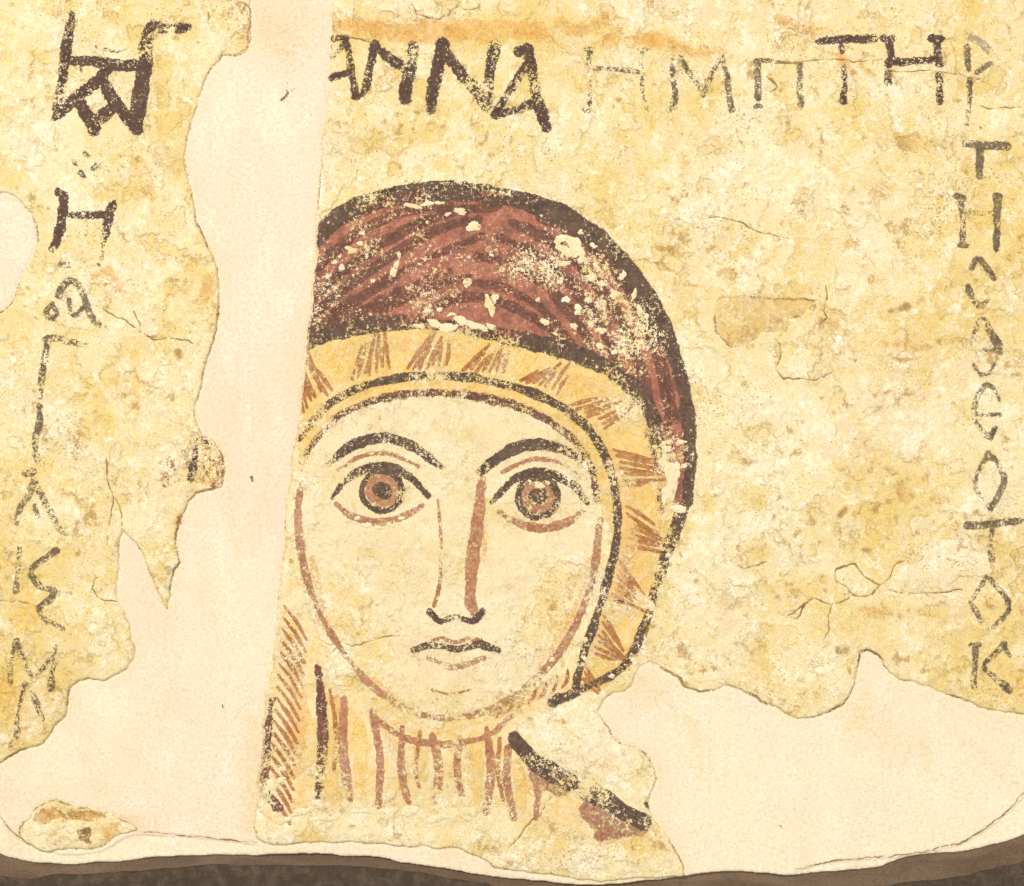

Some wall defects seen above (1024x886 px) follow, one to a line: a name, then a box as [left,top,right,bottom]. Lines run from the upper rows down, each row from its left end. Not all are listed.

spalling [0,0,676,885]
crack [776,340,832,383]
crack [789,560,962,637]
spalling [598,649,1024,876]